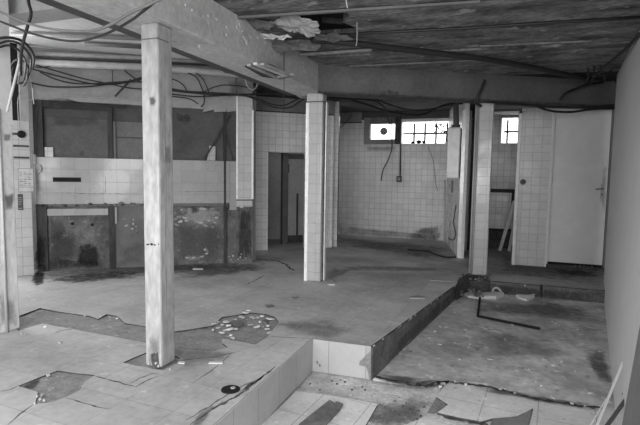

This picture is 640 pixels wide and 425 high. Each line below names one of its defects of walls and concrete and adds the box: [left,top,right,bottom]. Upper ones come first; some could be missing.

spalling [236,13,355,52]
peeling [174,207,221,228]
leakage [33,224,145,285]
leakage [348,228,439,256]
spalling [454,273,491,300]
peeling [17,309,146,343]
peeling [175,304,278,351]
peeling [20,372,93,404]
crack [93,373,157,387]
peeling [126,352,179,370]
crack [186,367,274,425]
leakage [591,354,608,378]